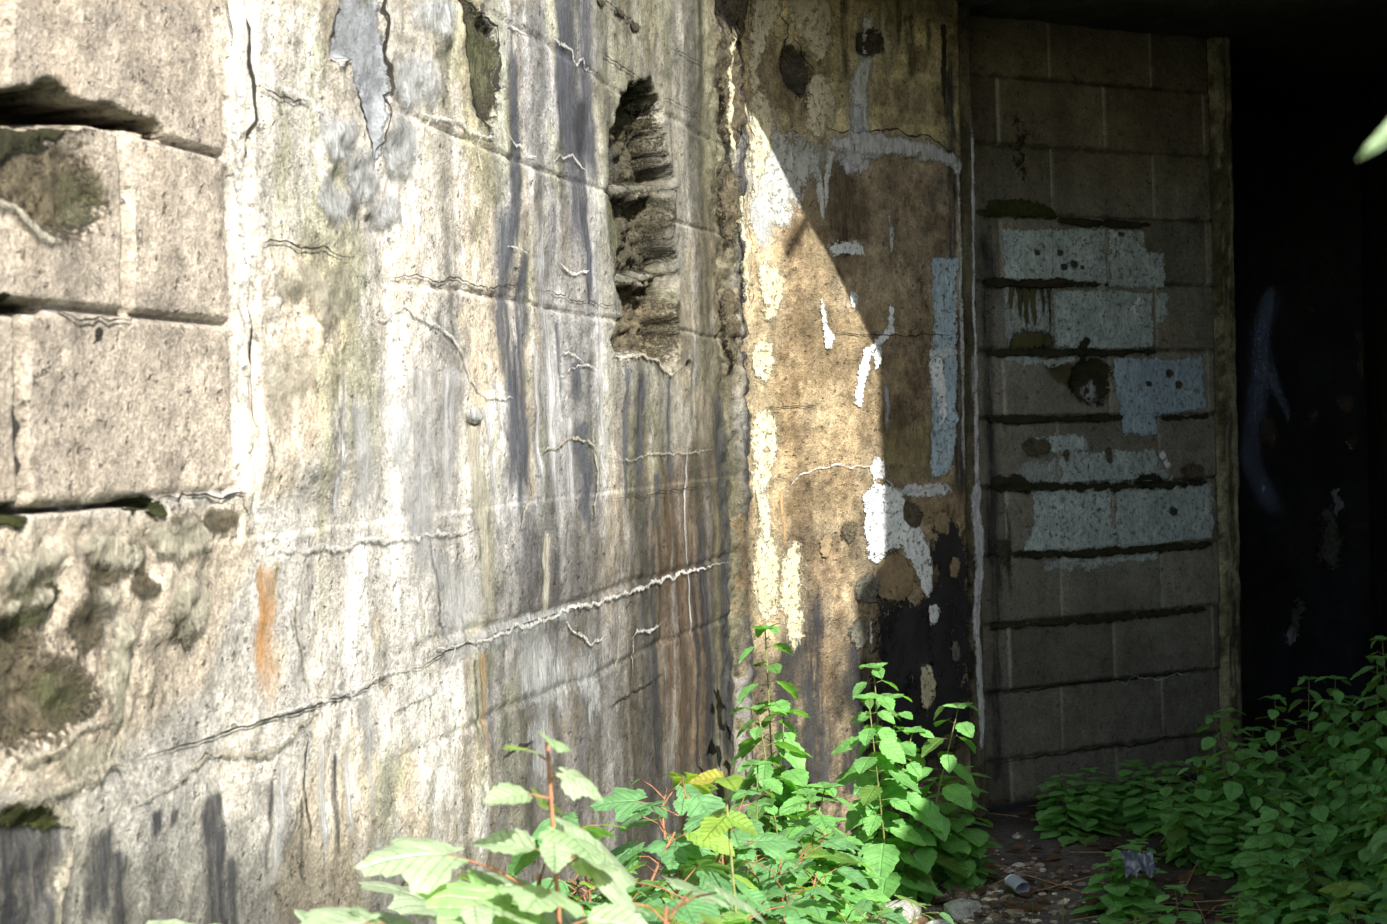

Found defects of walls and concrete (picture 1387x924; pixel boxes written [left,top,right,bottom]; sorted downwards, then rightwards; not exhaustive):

rust [258,563,278,669]
crack [227,0,353,514]
spalling [317,0,502,230]
crack [123,557,726,830]
leakage [261,0,605,711]
leakage [623,369,757,767]
leakage [736,69,753,520]
peeling [750,405,807,650]
peeling [747,0,963,322]
peeling [819,457,961,650]
leakage [776,60,1011,793]
peeling [1001,227,1215,573]